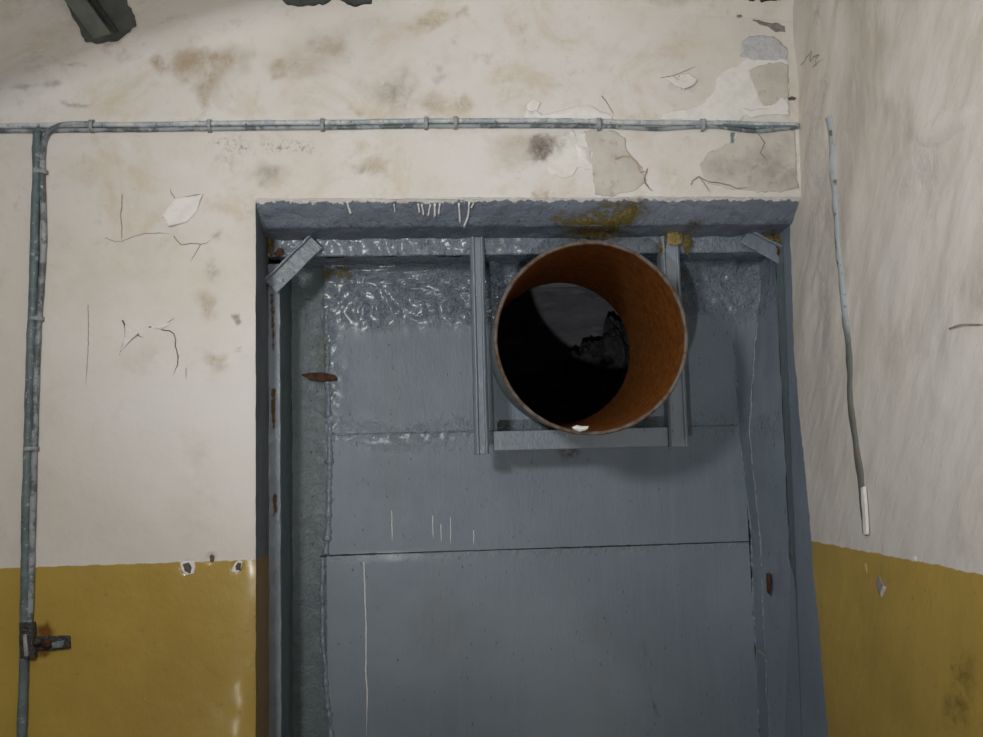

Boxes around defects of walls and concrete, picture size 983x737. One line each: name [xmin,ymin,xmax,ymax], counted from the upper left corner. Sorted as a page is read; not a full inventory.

peeling [524,96,653,197]
peeling [658,14,799,193]
crack [105,195,208,260]
crack [149,319,187,370]